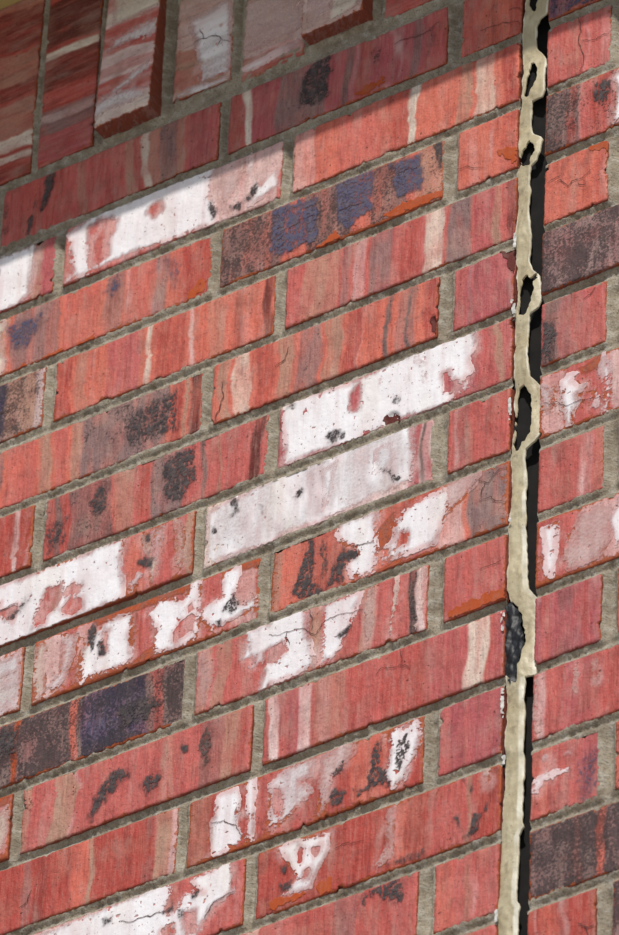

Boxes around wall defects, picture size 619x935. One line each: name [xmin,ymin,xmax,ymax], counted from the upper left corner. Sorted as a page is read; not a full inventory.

leakage [326,429,345,443]
crack [475,0,601,935]
leakage [292,540,359,598]
leakage [215,594,239,625]
leakage [87,624,105,655]